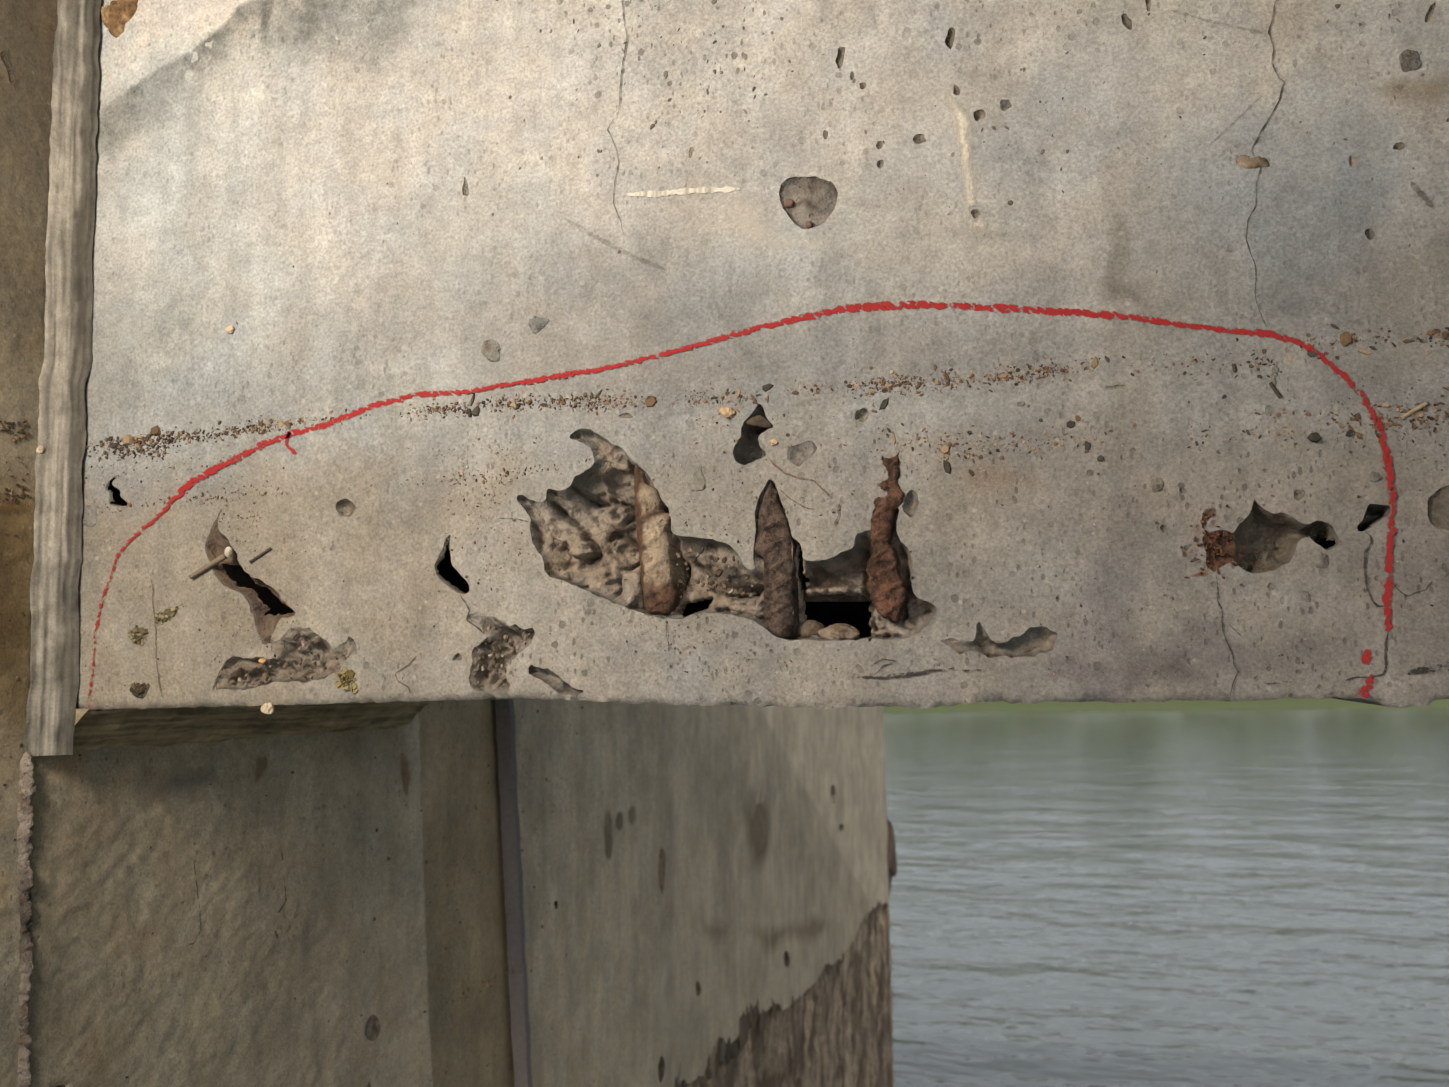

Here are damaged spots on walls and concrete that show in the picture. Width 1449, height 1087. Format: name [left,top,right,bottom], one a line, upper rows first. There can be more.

crack [1246,6,1285,326]
spalling [733,404,770,465]
spalling [855,408,869,422]
spalling [517,428,936,641]
spalling [1202,508,1216,530]
rust [1180,505,1258,586]
spalling [1233,490,1340,573]
spalling [1357,504,1391,532]
spalling [205,510,357,691]
spalling [452,612,583,697]
spalling [940,622,1058,658]